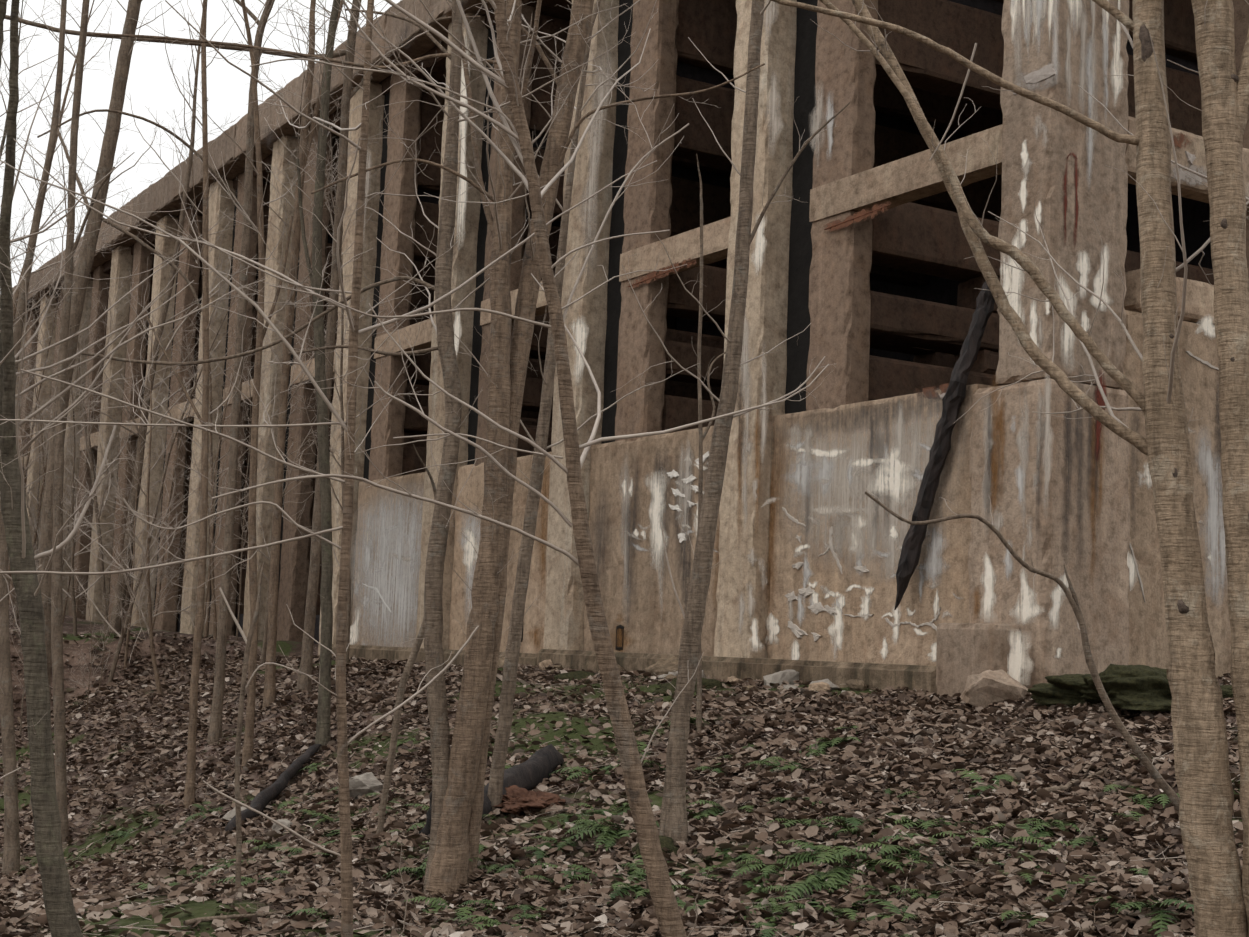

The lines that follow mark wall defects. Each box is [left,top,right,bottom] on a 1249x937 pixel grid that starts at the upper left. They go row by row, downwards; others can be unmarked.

water stain [1010,0,1122,168]
corrosion [1064,153,1079,242]
peeling [667,451,709,512]
water stain [983,378,1052,530]
water stain [1139,465,1152,486]
peeling [788,621,821,642]
peeling [784,586,837,615]
water stain [974,527,1068,682]
water stain [1127,543,1145,602]